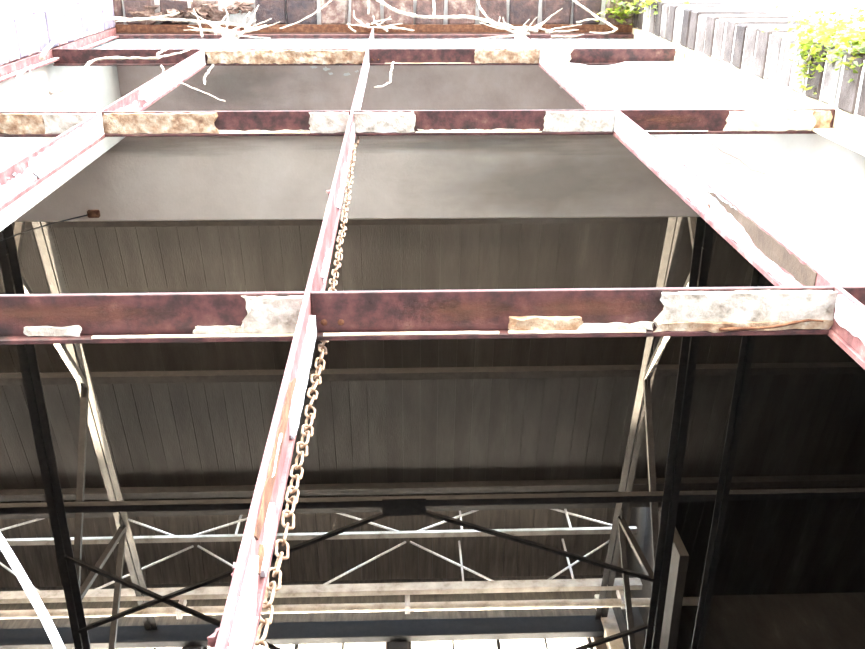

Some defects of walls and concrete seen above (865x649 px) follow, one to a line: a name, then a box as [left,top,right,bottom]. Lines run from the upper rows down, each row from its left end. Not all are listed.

peeling [0,29,865,477]
rust [254,378,297,575]
peeling [207,628,219,648]
peeling [228,503,278,649]